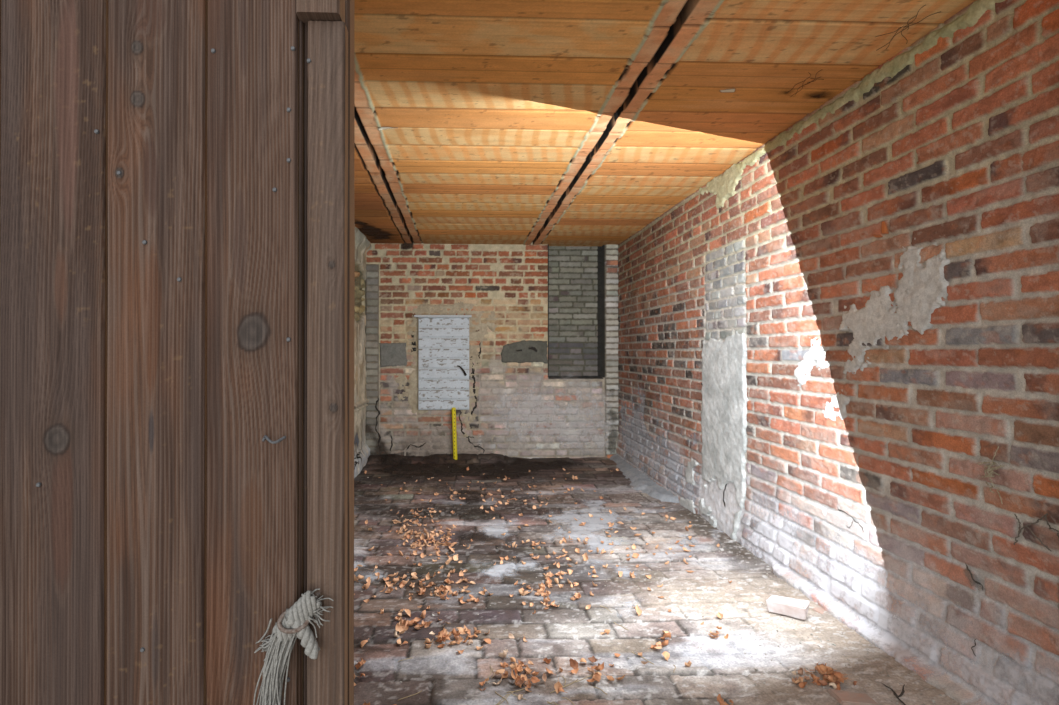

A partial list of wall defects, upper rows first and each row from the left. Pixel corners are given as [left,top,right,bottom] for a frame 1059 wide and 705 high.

crack [354,341,485,470]